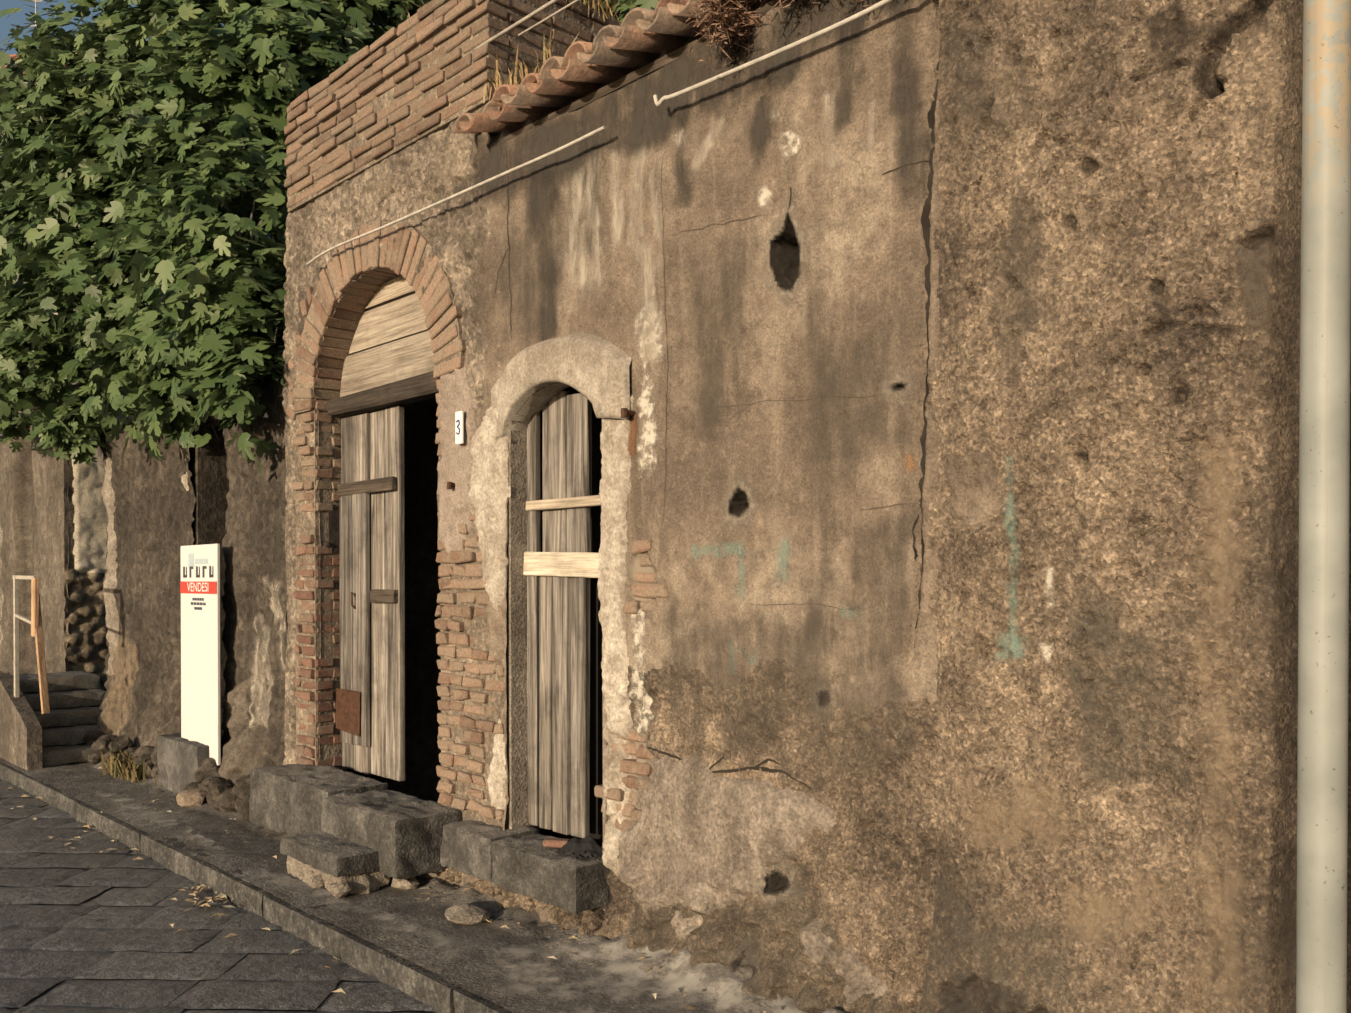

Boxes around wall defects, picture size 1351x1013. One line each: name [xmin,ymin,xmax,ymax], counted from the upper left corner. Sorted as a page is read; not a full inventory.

damp [470,0,909,341]
damp [895,48,929,178]
damp [642,249,656,360]
spalling [763,204,807,299]
crack [859,49,941,662]
peeling [594,376,668,877]
crack [755,602,858,610]
spalling [756,865,798,904]